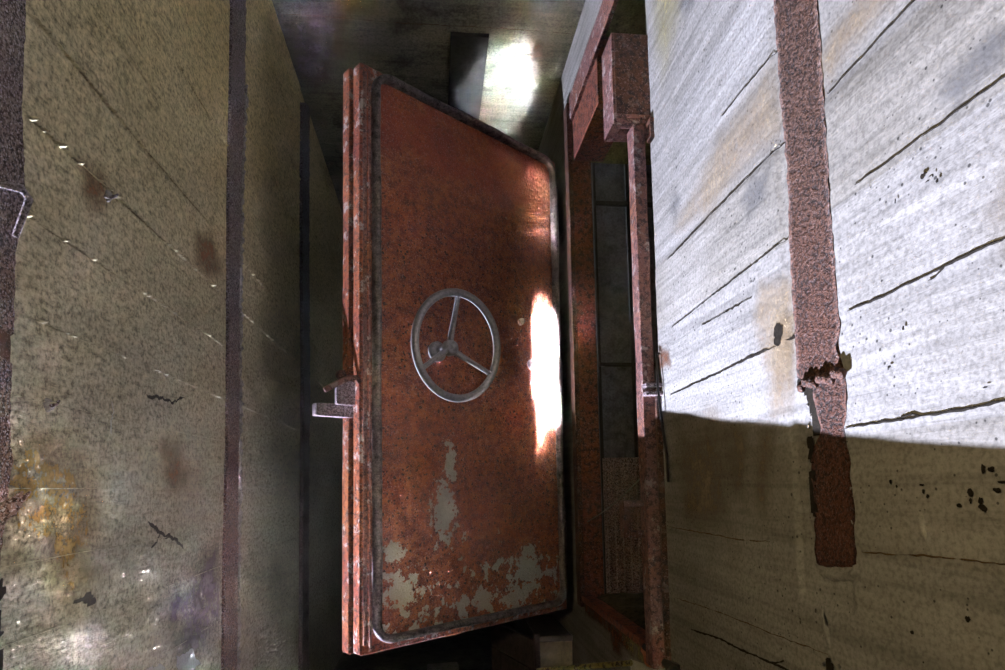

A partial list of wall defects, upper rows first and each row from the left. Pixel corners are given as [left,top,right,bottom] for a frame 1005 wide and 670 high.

crack [855,76,1005,185]
crack [848,237,1005,311]
rust [759,291,790,374]
crack [845,399,1005,429]